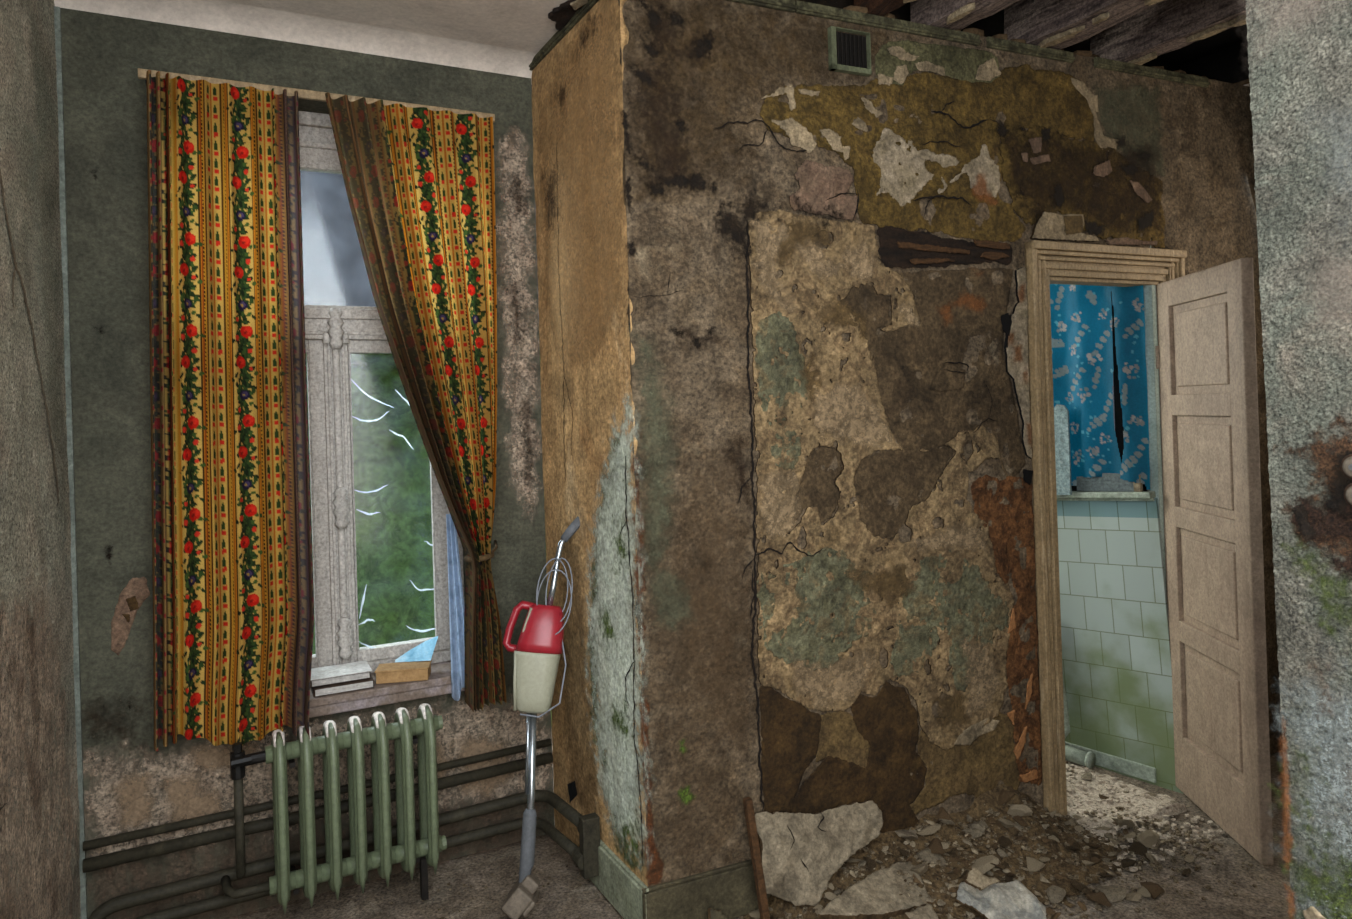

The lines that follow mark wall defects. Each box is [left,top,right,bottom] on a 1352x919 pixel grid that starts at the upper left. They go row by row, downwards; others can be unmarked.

leakage [496,0,834,503]
crack [737,221,827,872]
leakage [796,197,843,226]
flaking render [748,39,1166,833]